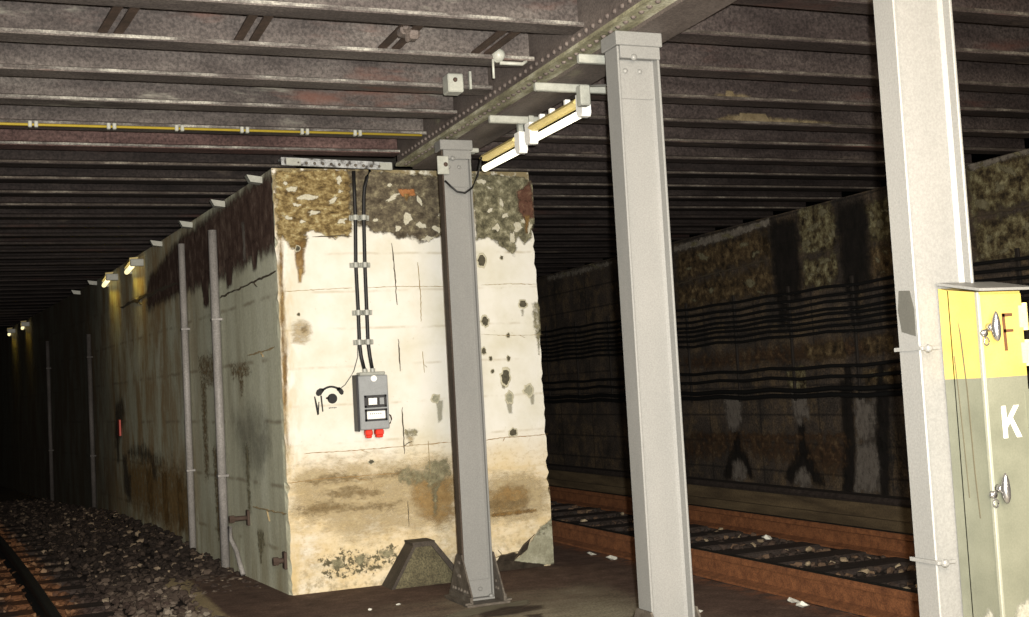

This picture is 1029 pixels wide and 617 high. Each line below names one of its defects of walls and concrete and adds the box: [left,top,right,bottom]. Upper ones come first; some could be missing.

rust [147,173,287,409]
rust [295,241,305,282]
crack [220,243,444,320]
peeling [274,169,441,252]
peeling [472,173,535,268]
crack [248,347,274,357]
leakage [115,399,156,500]
leakage [291,460,450,533]
leakage [724,432,752,479]
leakage [786,425,824,485]
leakage [840,367,856,492]
leakage [877,365,890,495]